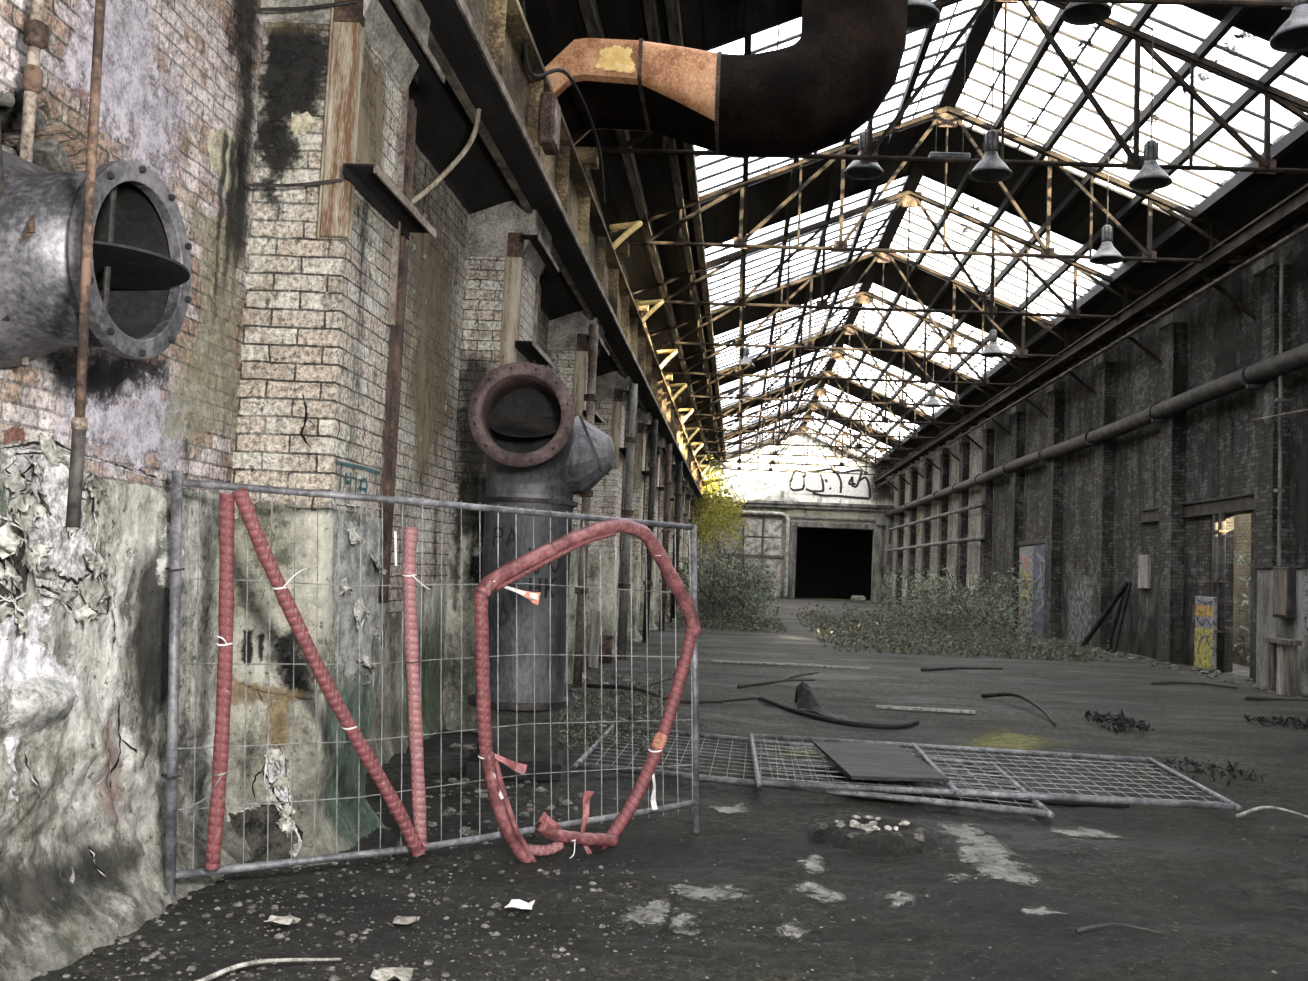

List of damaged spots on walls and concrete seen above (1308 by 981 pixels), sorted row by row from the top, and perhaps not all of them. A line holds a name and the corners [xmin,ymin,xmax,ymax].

water stain [214,0,296,311]
crack [300,393,313,449]
peeling [0,426,116,640]
water stain [135,532,183,764]
peeling [226,742,302,868]